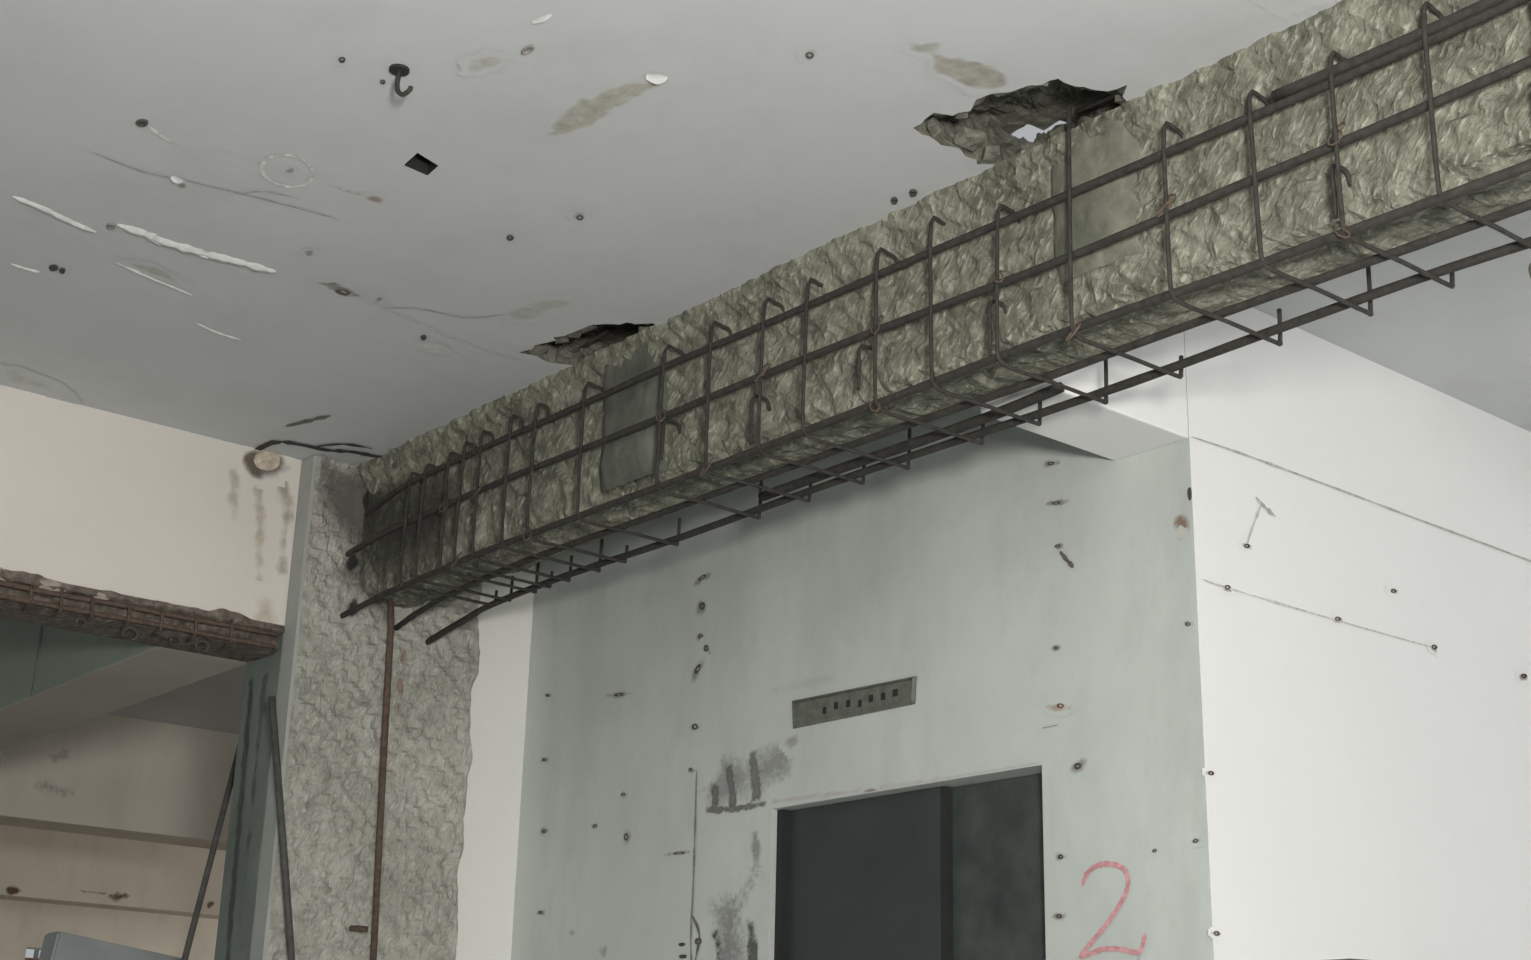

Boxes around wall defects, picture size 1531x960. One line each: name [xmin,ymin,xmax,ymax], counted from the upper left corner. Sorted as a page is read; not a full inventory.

peeling [536,72,671,140]
spalling [896,35,1127,165]
spalling [311,278,387,305]
spalling [520,323,655,366]
damp [220,457,299,625]
spalling [1041,495,1072,511]
spalling [0,567,285,662]
damp [764,665,850,704]
spalling [349,601,394,960]
damp [688,722,805,960]